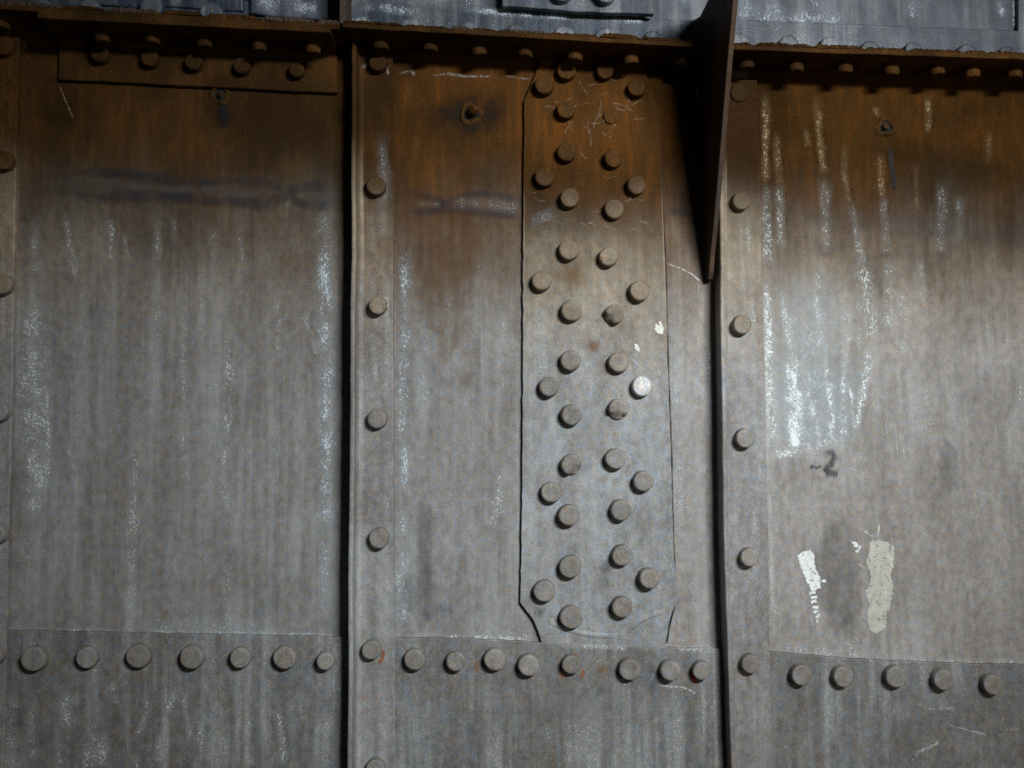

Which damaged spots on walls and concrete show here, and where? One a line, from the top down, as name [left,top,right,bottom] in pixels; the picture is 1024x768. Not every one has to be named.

corrosion [20,31,704,251]
corrosion [727,71,1024,257]
leakage [17,293,51,511]
leakage [315,246,336,526]
leakage [751,230,906,459]
peeling [798,550,826,623]
peeling [851,525,895,634]